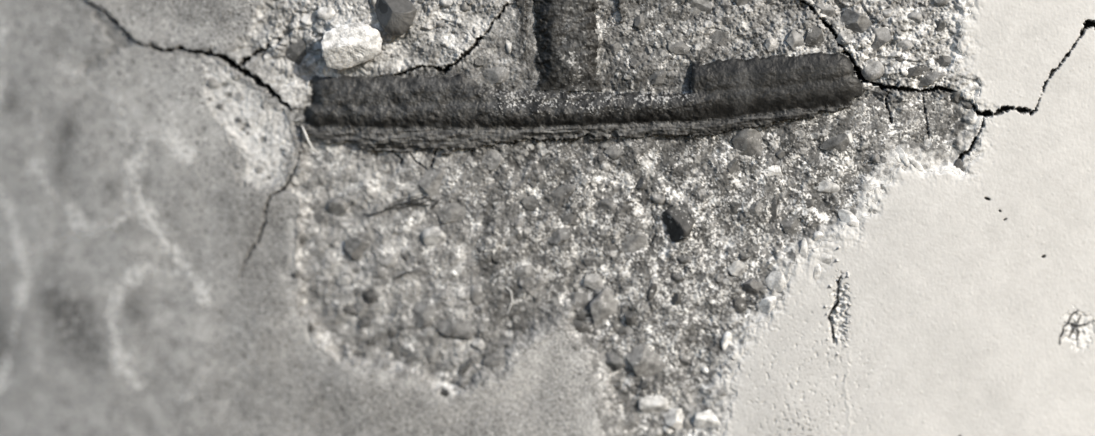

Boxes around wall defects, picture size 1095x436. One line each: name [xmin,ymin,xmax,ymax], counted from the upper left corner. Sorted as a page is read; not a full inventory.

crack [86,0,291,109]
crack [395,4,508,76]
crack [800,0,1095,159]
crack [242,152,300,270]
spalling [190,0,991,436]
peeling [1059,305,1095,352]